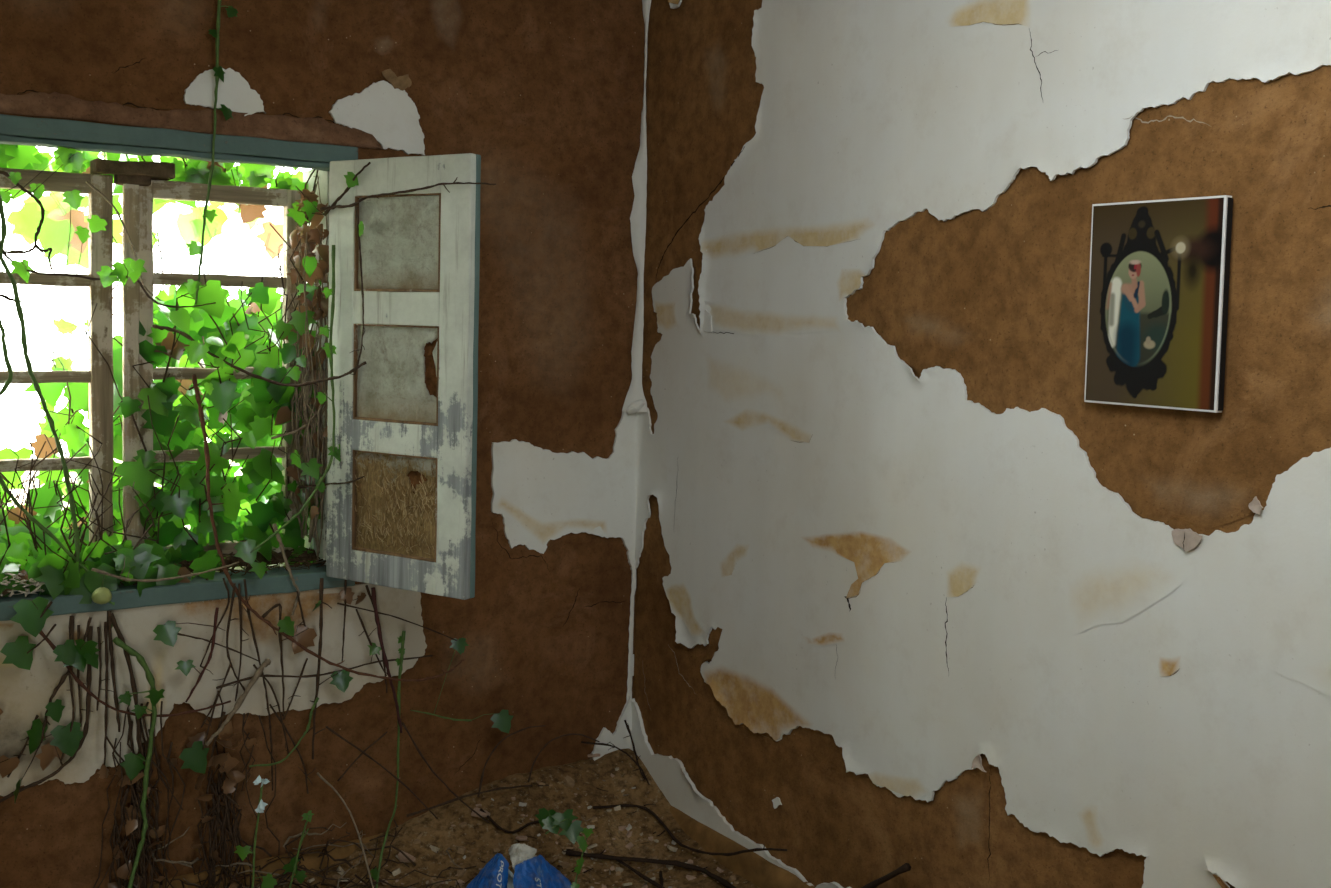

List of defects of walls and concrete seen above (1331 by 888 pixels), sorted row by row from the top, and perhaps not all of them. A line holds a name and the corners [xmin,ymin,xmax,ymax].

flaking render [329,69,425,156]
flaking render [491,0,1146,888]
flaking render [846,65,1331,552]